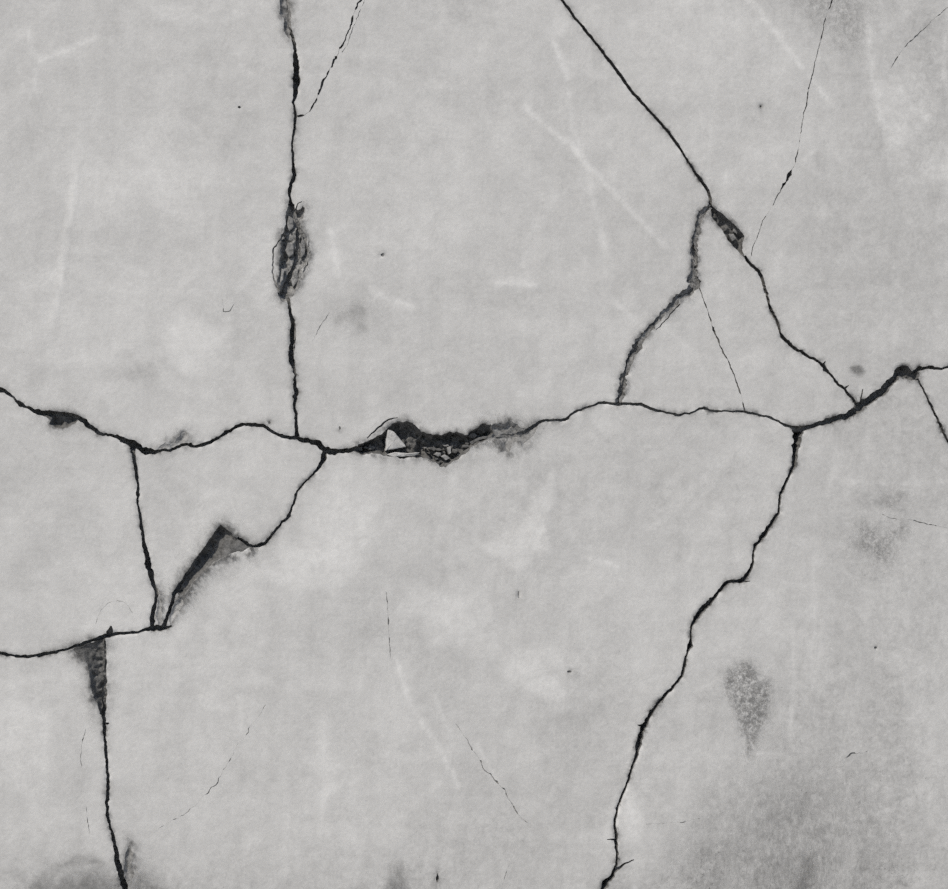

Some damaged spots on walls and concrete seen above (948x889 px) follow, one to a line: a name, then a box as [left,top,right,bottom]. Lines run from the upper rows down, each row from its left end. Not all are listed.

flaking render [277,205,312,302]
crack [0,0,365,889]
flaking render [355,417,537,467]
crack [470,0,948,889]
flaking render [155,524,255,625]
crack [456,724,527,823]